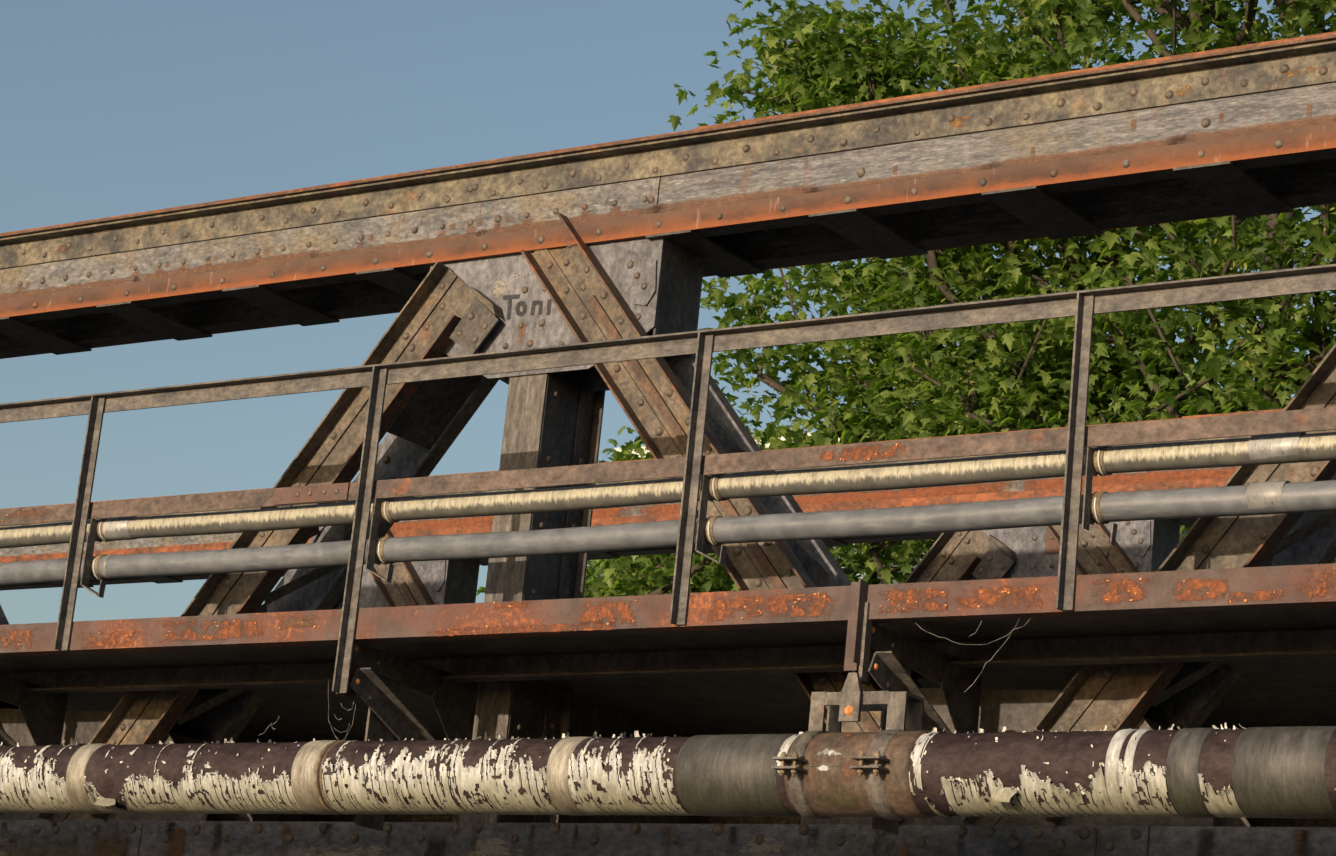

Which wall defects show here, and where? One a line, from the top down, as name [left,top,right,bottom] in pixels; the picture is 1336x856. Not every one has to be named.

rust [0,104,1336,318]
rust [709,593,834,622]
rust [880,585,1043,613]
rust [1093,578,1148,604]
rust [1174,579,1283,603]
rust [164,619,262,641]
peeling [0,737,310,814]
peeling [322,731,694,816]
peeling [909,725,1183,818]
peeling [1198,774,1250,818]